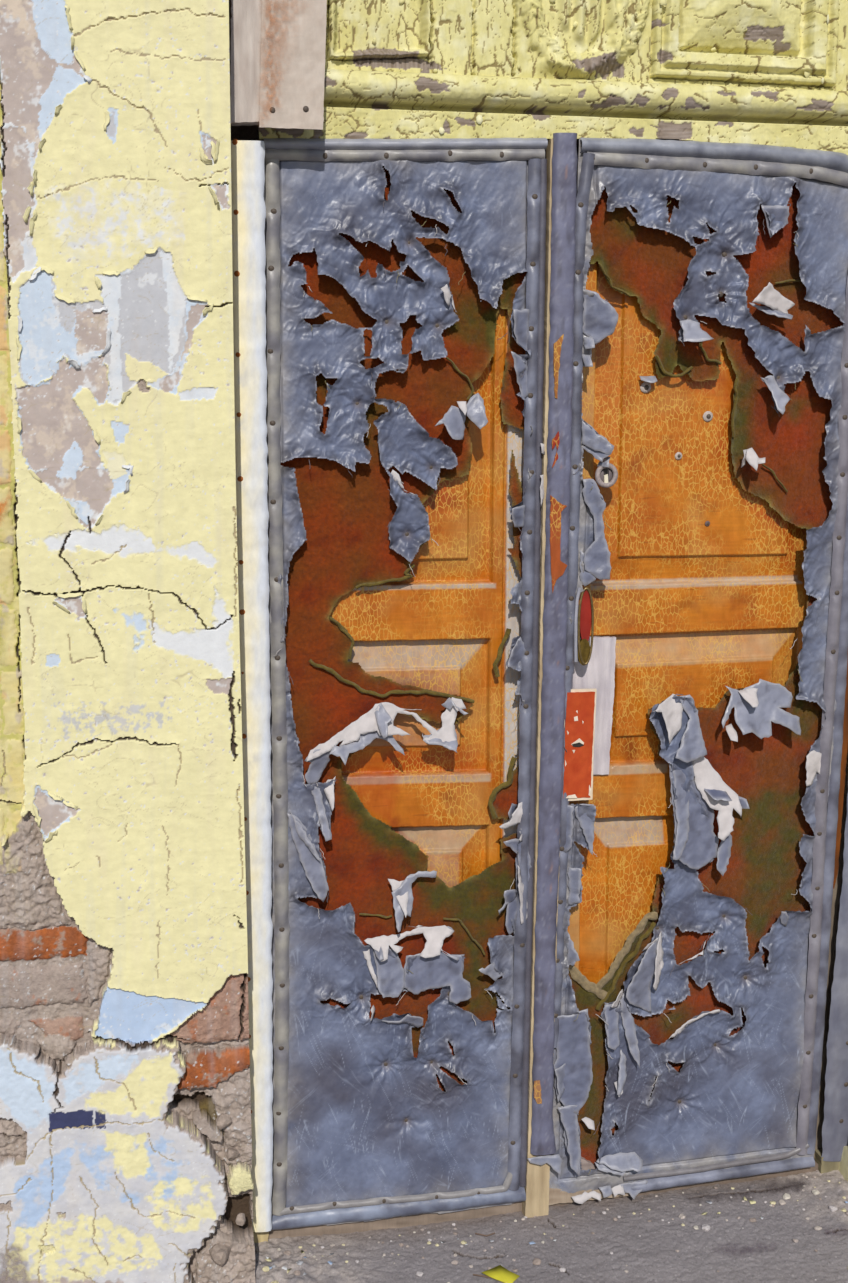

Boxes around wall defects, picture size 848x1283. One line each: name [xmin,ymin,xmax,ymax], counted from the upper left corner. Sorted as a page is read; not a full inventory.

crack [74,7,226,61]
crack [0,67,8,177]
crack [36,79,231,210]
crack [4,214,12,318]
peeling [0,0,218,567]
peeling [46,653,61,667]
crack [0,479,238,803]
peeling [114,586,235,694]
crack [229,671,244,882]
flaking render [0,785,307,1283]